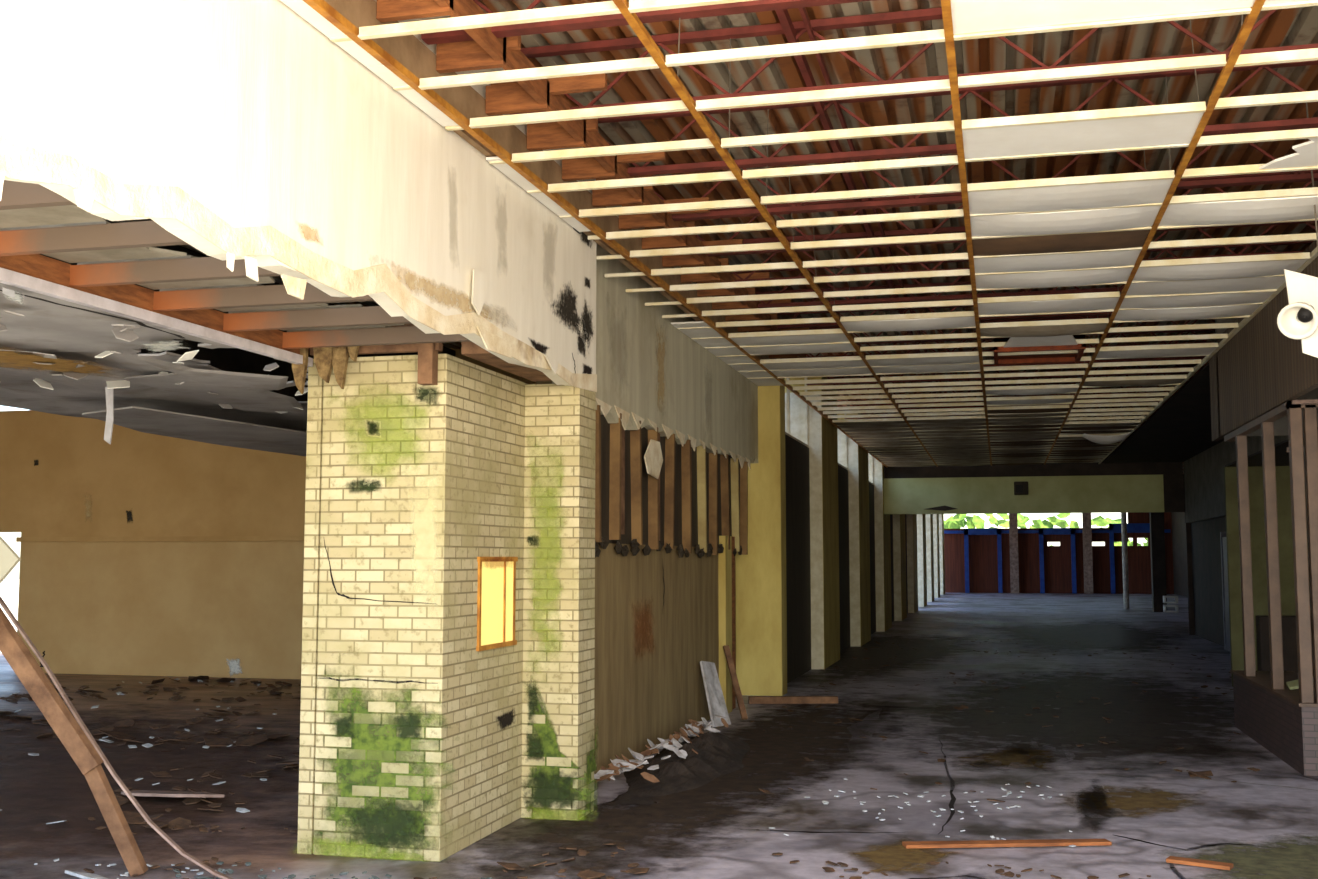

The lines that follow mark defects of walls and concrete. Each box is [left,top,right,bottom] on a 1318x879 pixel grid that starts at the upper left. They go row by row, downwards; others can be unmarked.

flaking render [0,134,750,479]
leakage [553,277,593,357]
crack [897,740,1318,834]
crack [732,826,905,834]
crack [909,871,985,879]